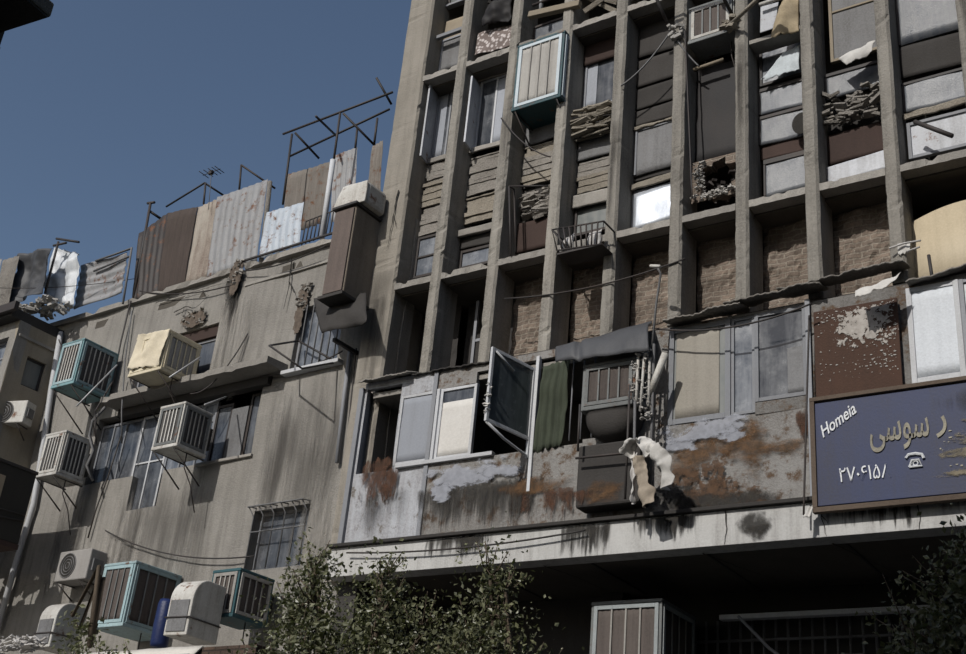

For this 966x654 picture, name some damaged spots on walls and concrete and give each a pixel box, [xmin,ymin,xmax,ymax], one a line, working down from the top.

peeling [816,300,899,381]
corrosion [359,457,398,511]
peeling [426,455,521,503]
corrosion [503,477,617,519]
leakage [561,522,610,553]
leakage [639,486,776,539]